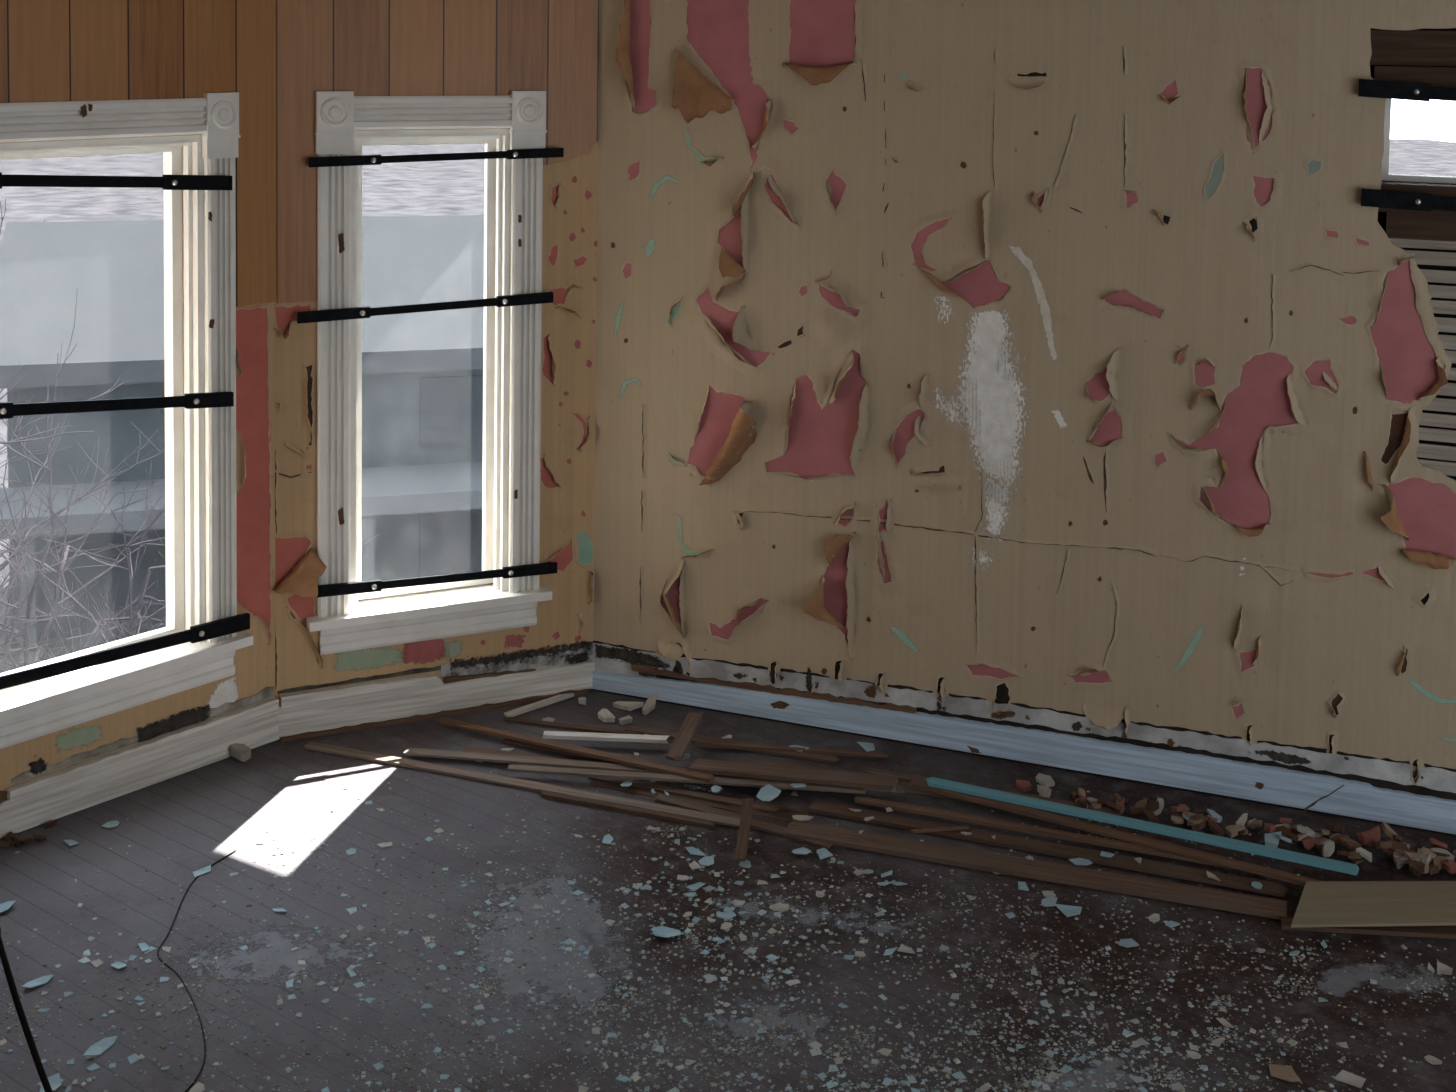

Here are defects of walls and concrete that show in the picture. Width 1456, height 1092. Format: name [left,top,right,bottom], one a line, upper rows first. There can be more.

damp [928,291,1031,573]
flaking render [0,736,138,803]
flaking render [208,632,1456,800]